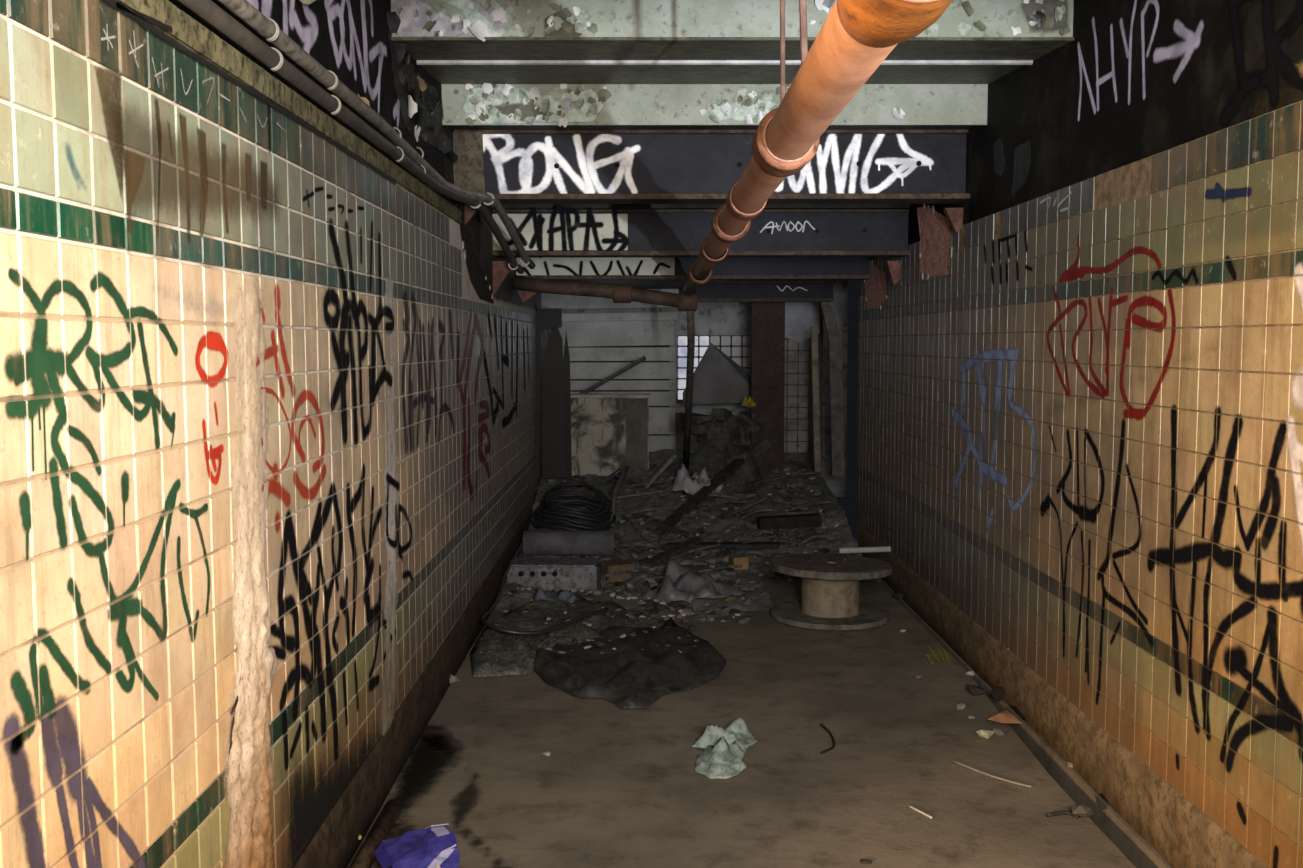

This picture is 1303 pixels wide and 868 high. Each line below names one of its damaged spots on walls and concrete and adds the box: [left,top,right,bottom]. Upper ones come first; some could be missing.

peeling [810,0,836,32]
peeling [927,24,939,36]
peeling [949,0,987,36]
peeling [1008,0,1070,36]
peeling [387,0,612,163]
peeling [699,84,791,124]
water stain [381,278,400,736]
efflorescence [223,289,278,868]
water stain [388,726,461,839]
water stain [455,777,481,845]